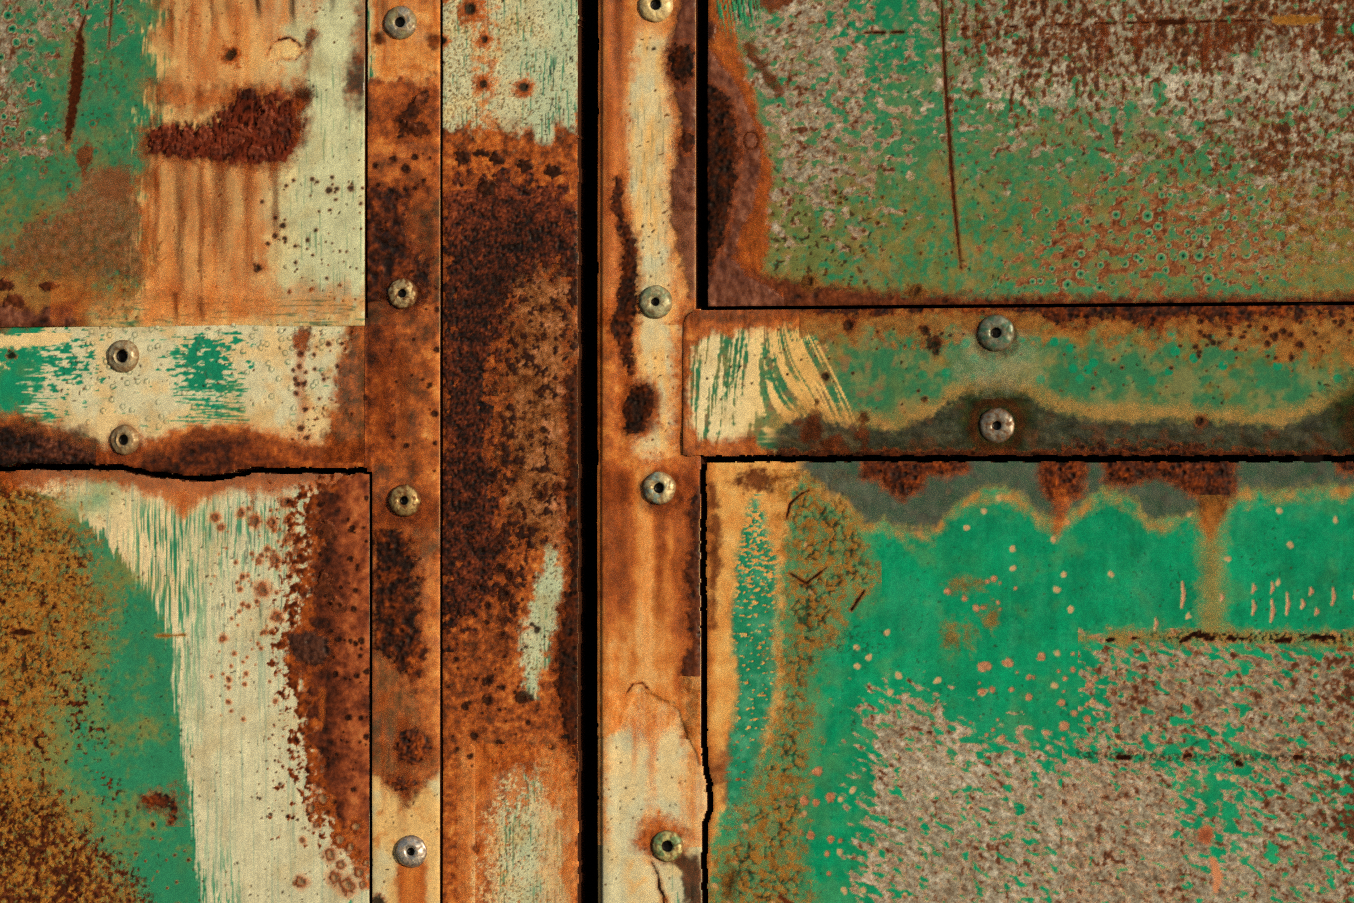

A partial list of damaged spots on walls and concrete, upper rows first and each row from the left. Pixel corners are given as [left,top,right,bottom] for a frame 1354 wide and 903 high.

spalling [310,153,435,230]
peeling [717,0,1354,361]
peeling [0,333,72,350]
rust [0,0,579,903]
spalling [292,330,354,448]
rust [597,0,1354,903]
spalling [0,486,152,903]
spalling [210,498,369,721]
spalling [326,714,369,761]
peeling [800,628,1354,903]